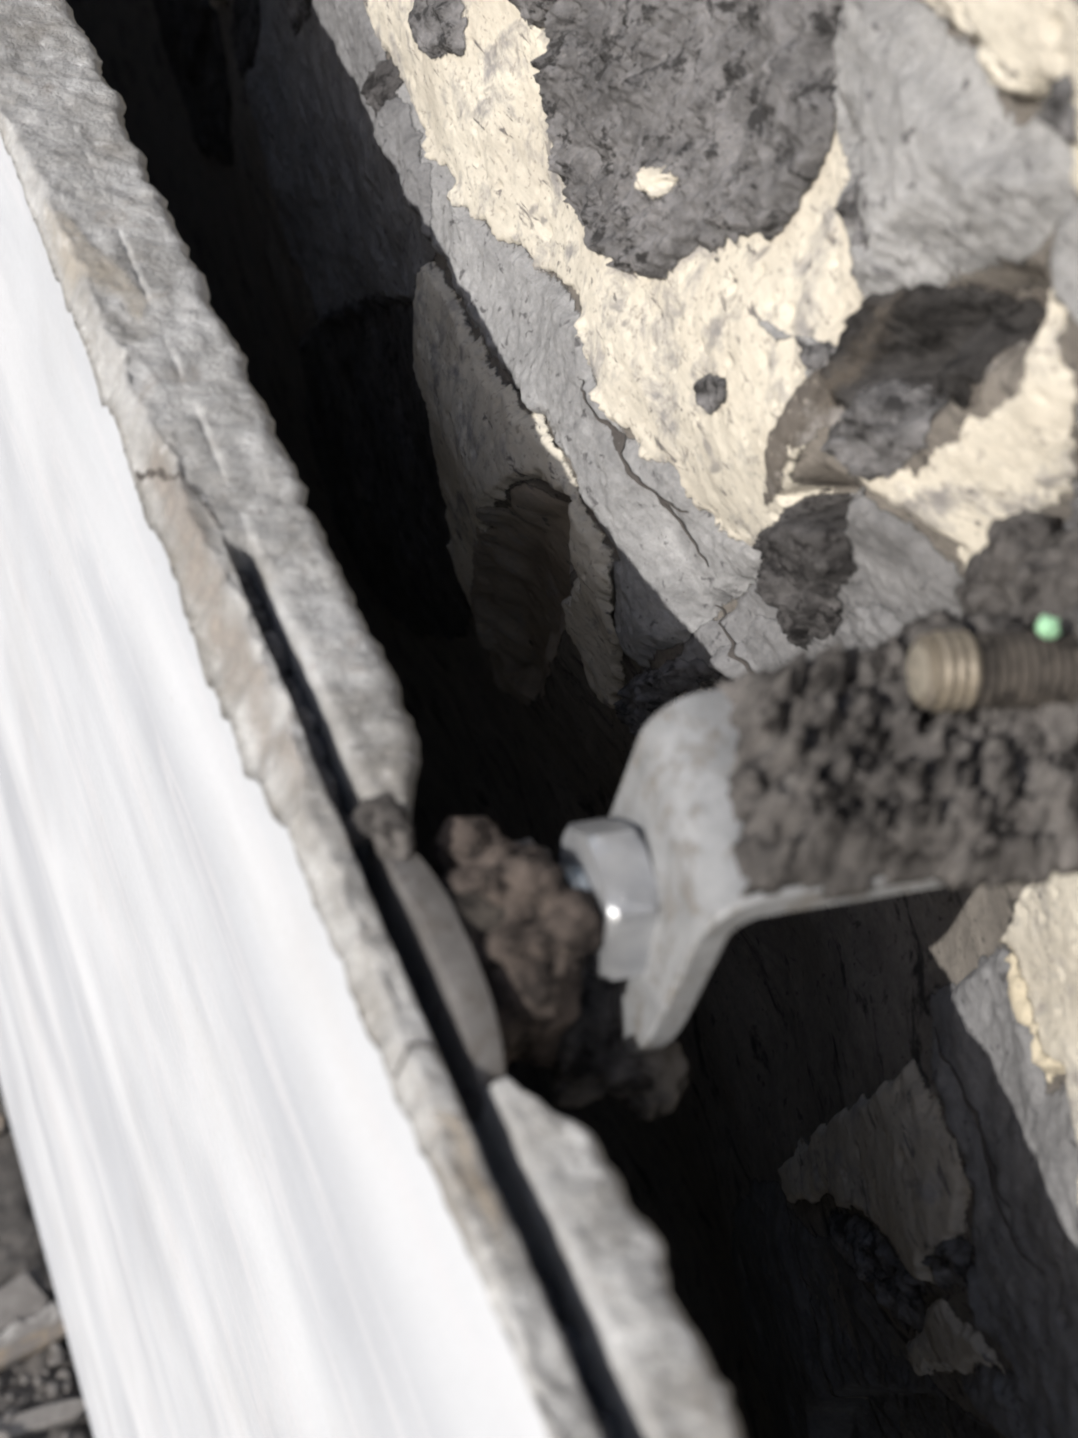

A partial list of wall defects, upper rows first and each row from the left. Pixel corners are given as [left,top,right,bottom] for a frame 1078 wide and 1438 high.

spalling [967,285,1050,406]
spalling [763,367,845,505]
crack [136,467,223,531]